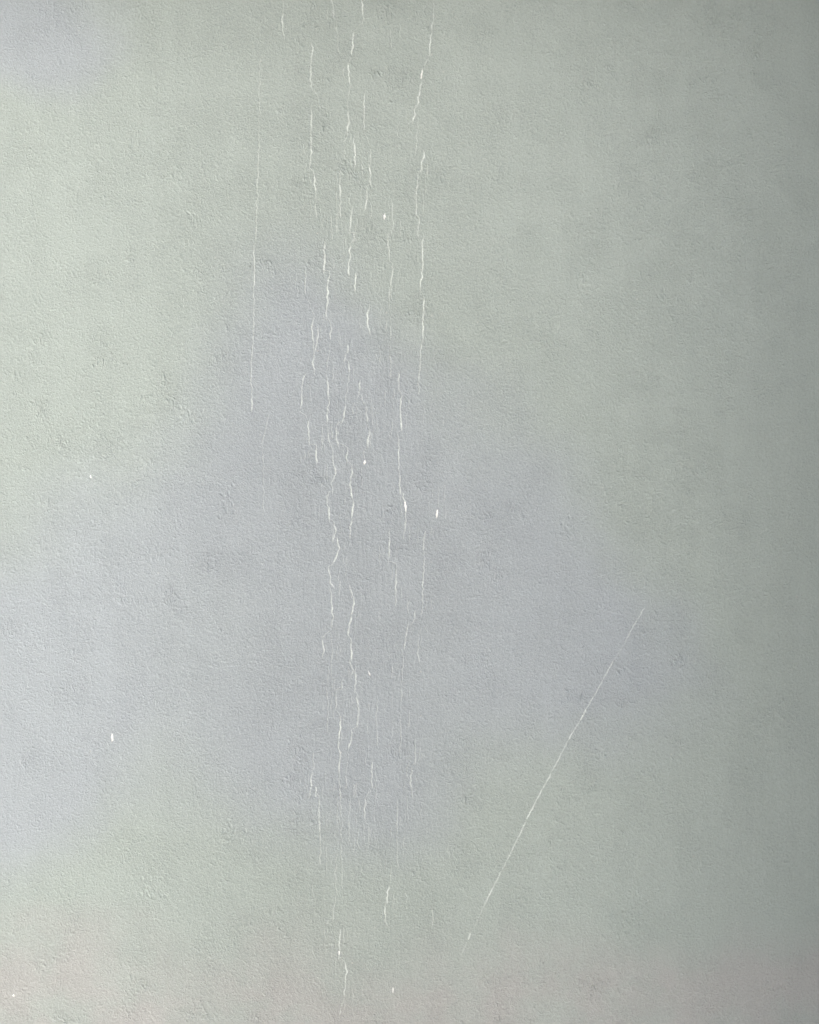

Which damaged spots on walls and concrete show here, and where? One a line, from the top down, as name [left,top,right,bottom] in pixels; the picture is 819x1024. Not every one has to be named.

crack [250,56,270,516]
crack [294,0,447,1016]